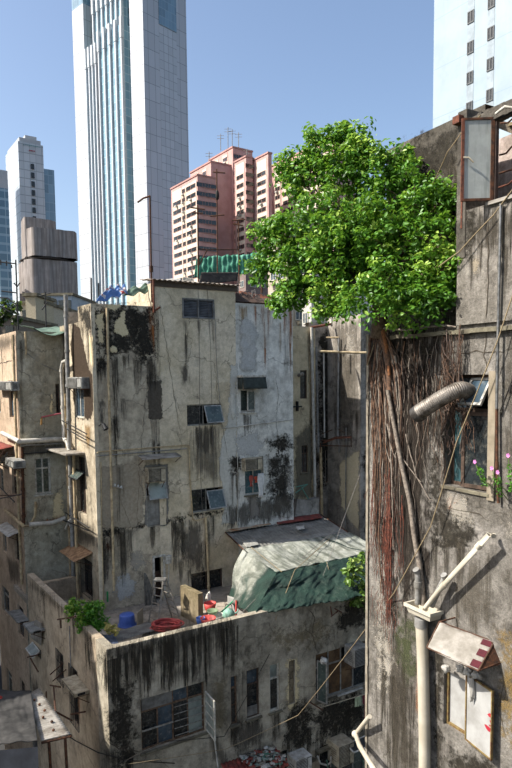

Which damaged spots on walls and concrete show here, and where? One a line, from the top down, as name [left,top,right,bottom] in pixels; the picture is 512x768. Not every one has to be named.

leakage [465,205,512,288]
leakage [78,302,159,443]
leakage [166,321,358,582]
leakage [79,521,155,584]
leakage [270,318,494,768]
leakage [30,581,243,768]
leakage [212,719,262,763]